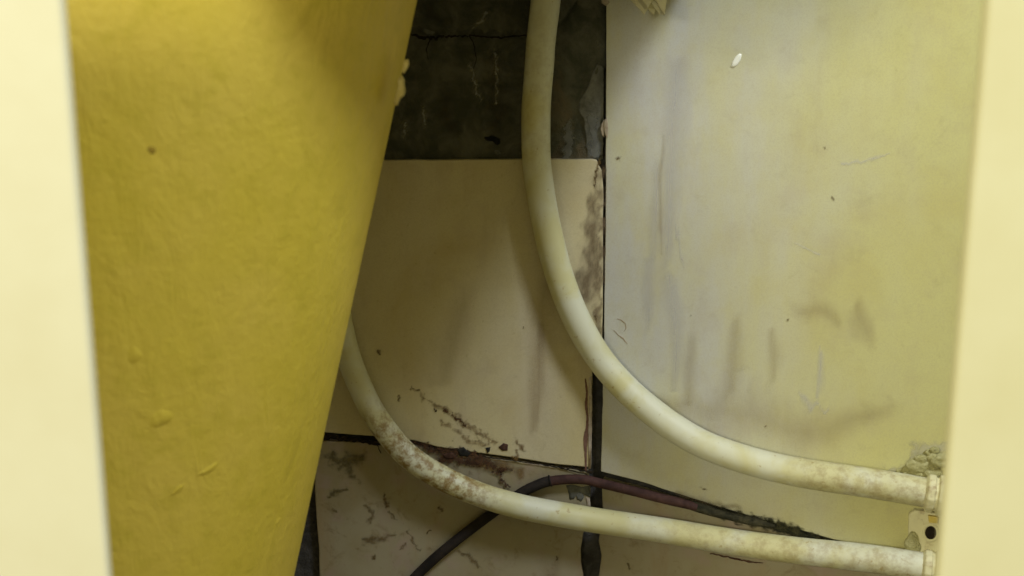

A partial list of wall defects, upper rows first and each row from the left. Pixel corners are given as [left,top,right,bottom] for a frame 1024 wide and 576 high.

crack [410,34,527,70]
corrosion [412,389,523,488]